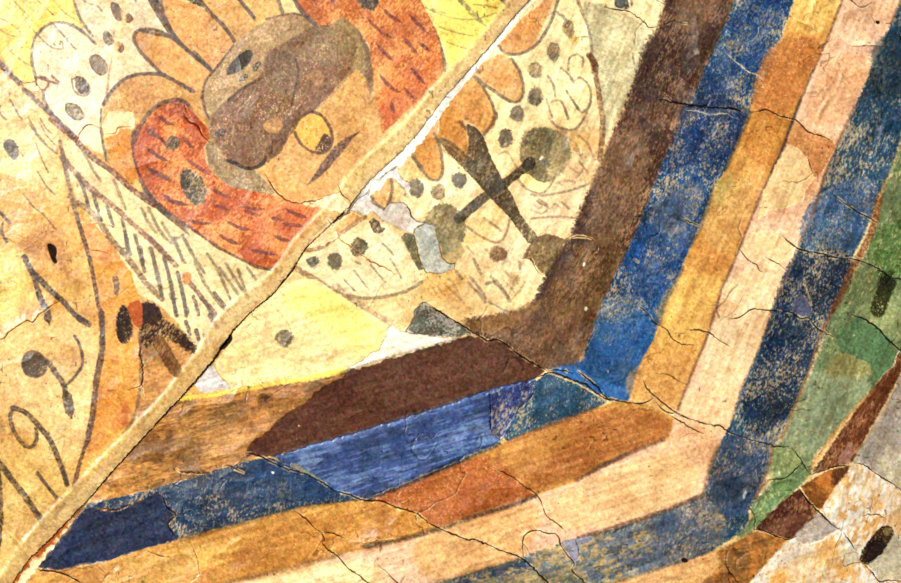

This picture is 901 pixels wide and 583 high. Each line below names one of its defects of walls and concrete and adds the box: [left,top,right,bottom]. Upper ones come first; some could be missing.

crack [604,0,693,30]
crack [851,0,901,38]
crack [728,54,765,80]
crack [658,92,832,172]
crack [682,218,702,227]
crack [833,194,880,225]
crack [638,234,901,348]
peeling [247,301,545,527]
crack [176,302,901,583]
crack [147,492,202,576]
crack [36,566,116,583]